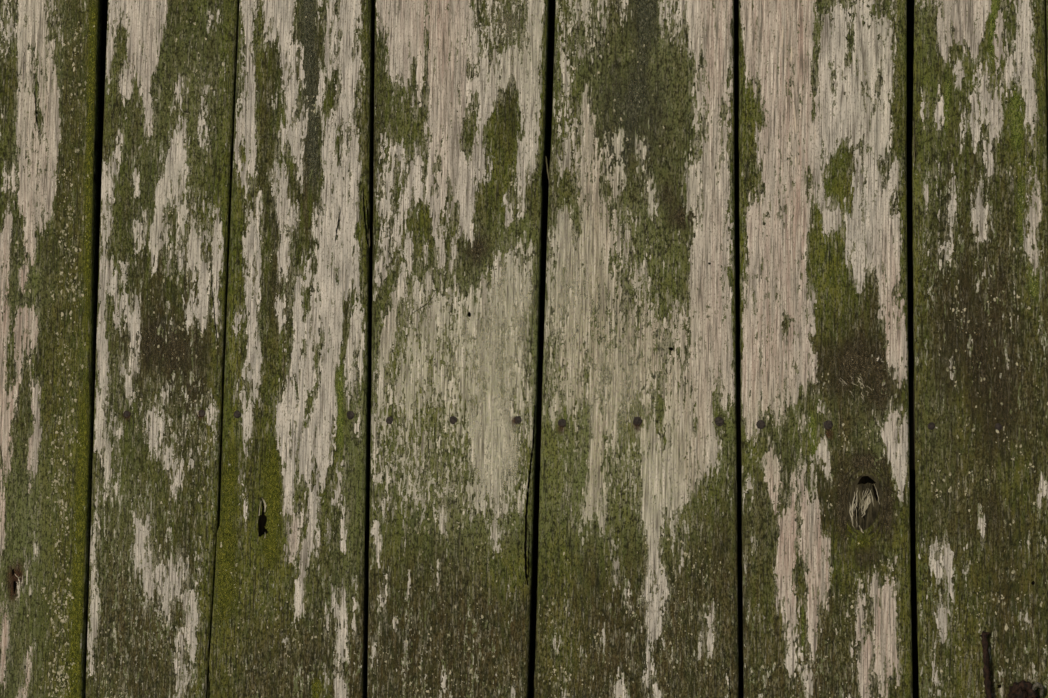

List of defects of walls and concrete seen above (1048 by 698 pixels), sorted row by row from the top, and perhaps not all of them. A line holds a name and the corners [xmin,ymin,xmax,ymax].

peeling [0,0,87,698]
leakage [265,452,279,561]
peeling [542,0,1048,698]
leakage [1010,92,1022,149]